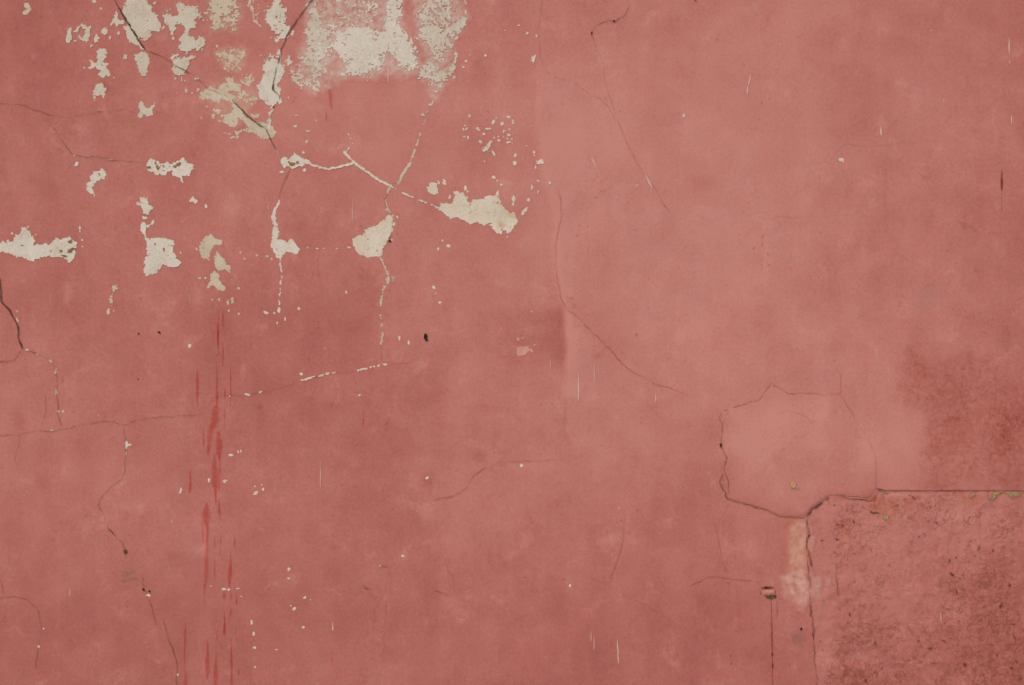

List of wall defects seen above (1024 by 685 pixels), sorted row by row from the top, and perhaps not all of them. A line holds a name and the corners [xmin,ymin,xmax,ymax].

peeling [65,0,474,139]
peeling [86,168,107,196]
peeling [146,157,194,183]
peeling [280,115,322,173]
crack [310,99,439,215]
peeling [426,114,551,237]
peeling [0,226,83,263]
peeling [136,197,182,276]
peeling [196,234,240,315]
peeling [239,200,398,324]
crack [299,256,395,396]